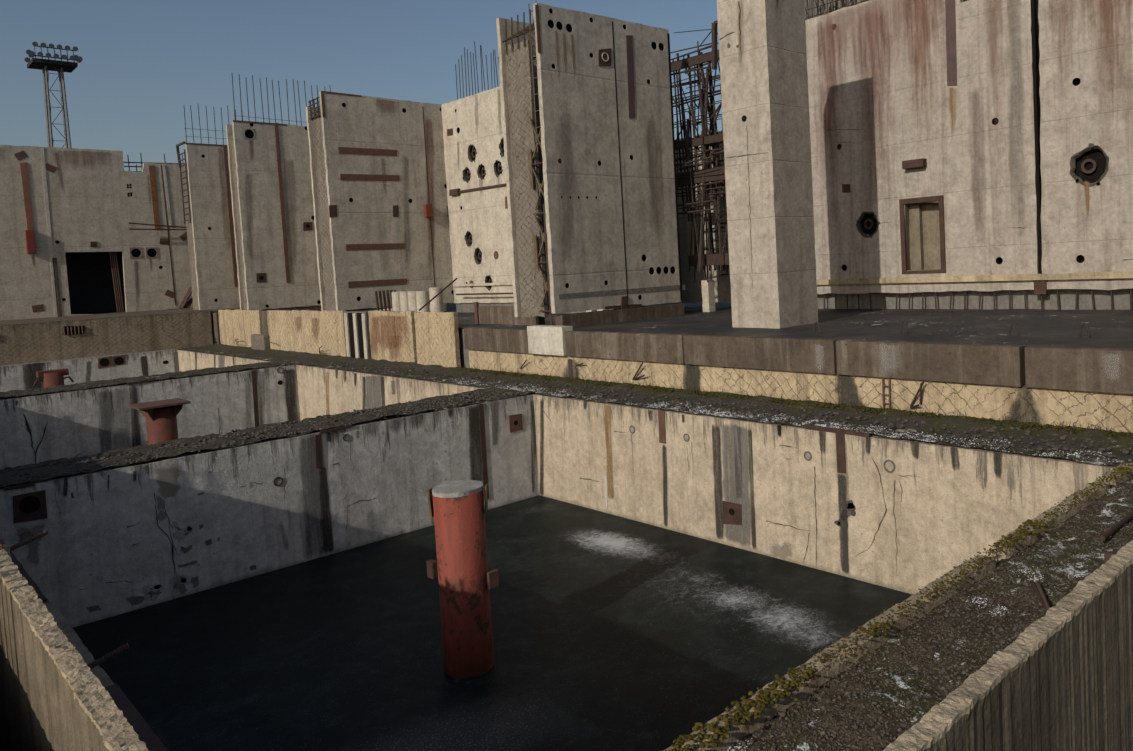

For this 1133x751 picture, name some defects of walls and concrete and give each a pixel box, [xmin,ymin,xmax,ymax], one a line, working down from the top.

rust [821,26,835,148]
crack [23,414,48,463]
crack [127,493,179,588]